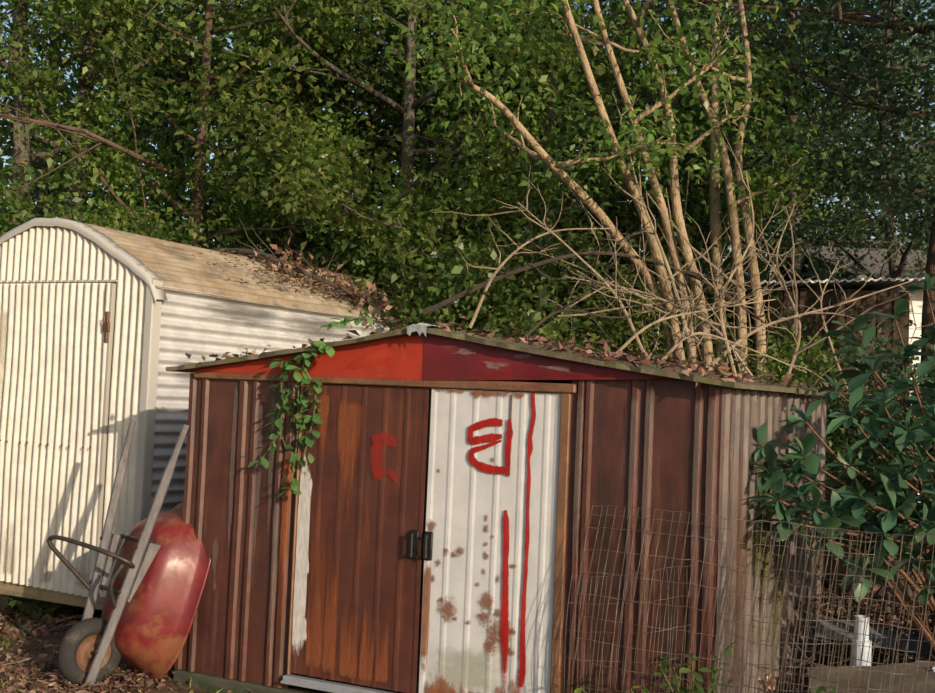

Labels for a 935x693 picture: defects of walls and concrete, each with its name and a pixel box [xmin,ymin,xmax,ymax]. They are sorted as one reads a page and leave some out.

rust [318,394,361,489]
rust [305,575,388,682]
rust [421,548,463,668]
rust [467,516,515,656]
rust [424,677,479,693]